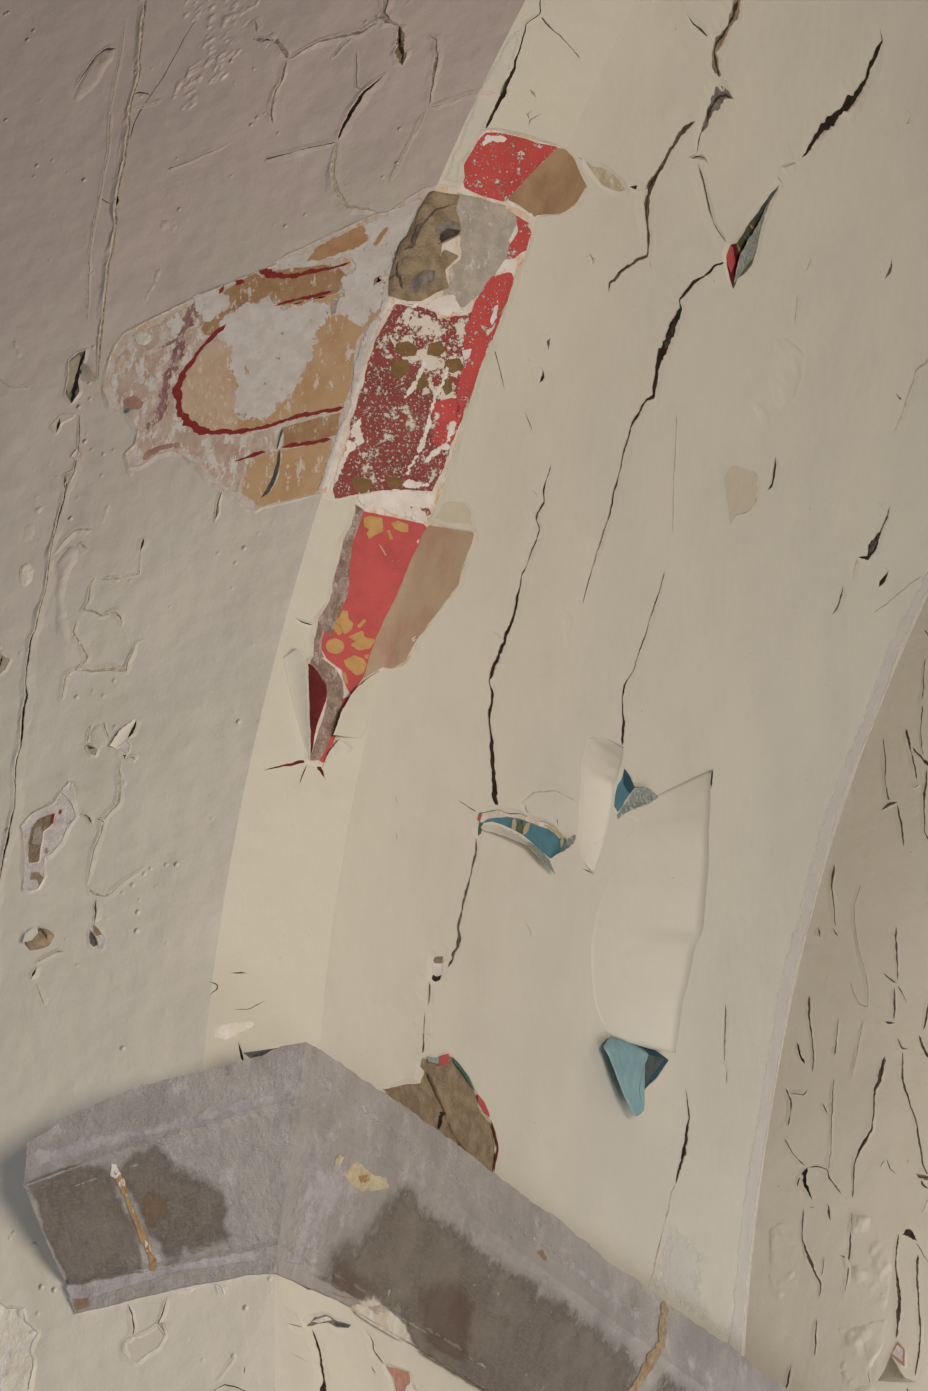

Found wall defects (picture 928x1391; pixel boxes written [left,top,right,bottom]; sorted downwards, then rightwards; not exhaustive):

flaking render [506,148,630,218]
crack [775,28,884,176]
peeling [193,198,423,421]
crack [579,0,753,605]
flaking render [283,501,476,767]
crack [411,461,558,1054]
peeling [472,737,712,1116]
damp [29,1099,259,1303]
damp [289,1146,356,1264]
flaking render [378,1049,500,1175]
damp [322,1190,637,1391]
crack [783,864,928,1391]